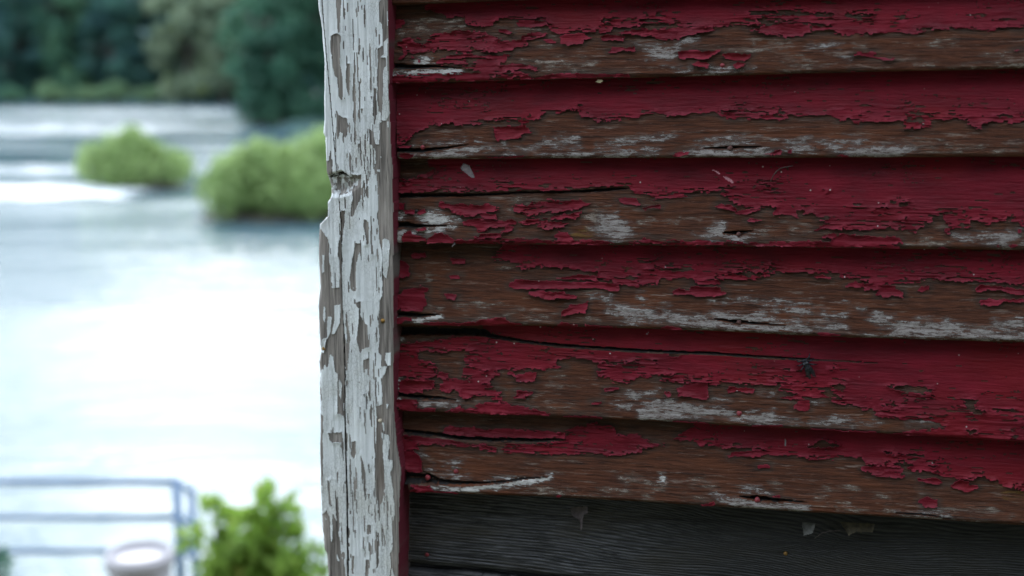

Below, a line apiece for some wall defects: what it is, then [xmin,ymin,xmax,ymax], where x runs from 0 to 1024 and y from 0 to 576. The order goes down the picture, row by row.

crack [405,471,549,485]
peeling [318,0,1024,576]